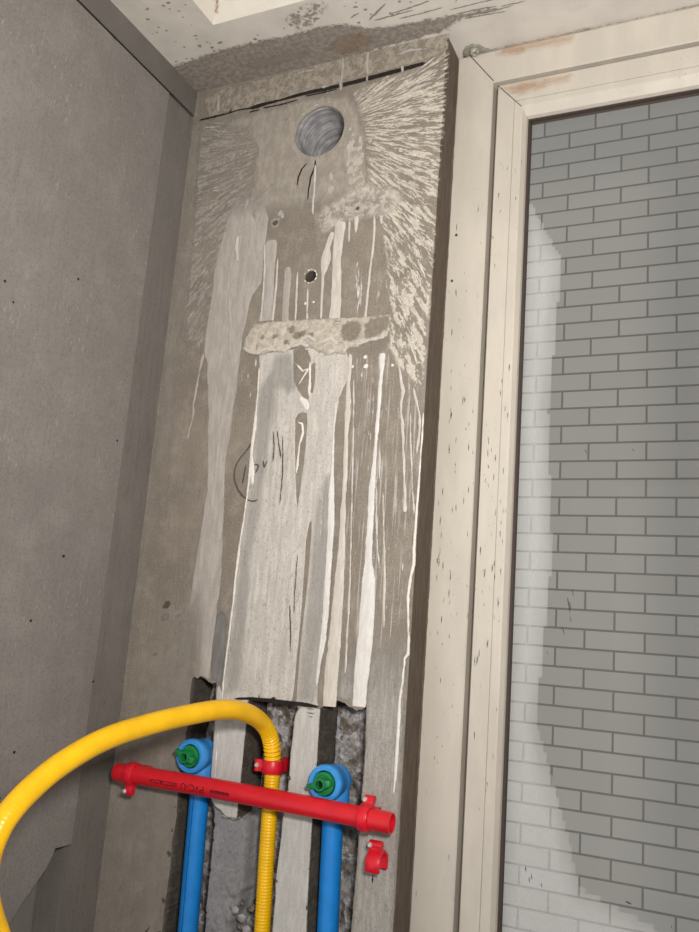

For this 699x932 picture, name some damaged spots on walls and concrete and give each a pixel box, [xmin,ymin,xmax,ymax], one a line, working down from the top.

crack [77,0,426,121]
crack [297,161,316,200]
water stain [175,0,524,297]
spalling [261,326,313,344]
peeling [342,316,389,341]
water stain [392,294,426,364]
water stain [211,612,226,684]
spalling [205,801,262,932]